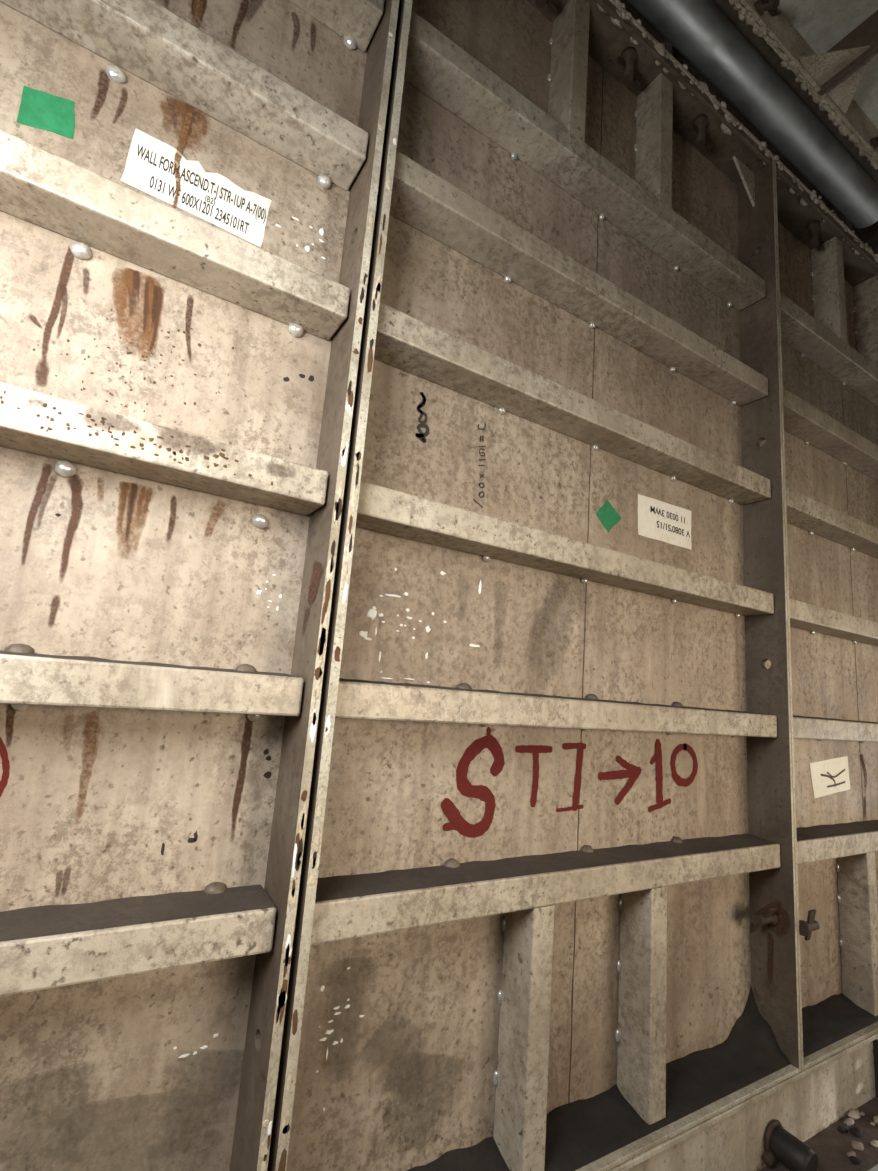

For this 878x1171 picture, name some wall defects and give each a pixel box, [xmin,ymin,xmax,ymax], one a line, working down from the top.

corrosion [231,0,262,48]
corrosion [91,70,109,117]
corrosion [114,89,127,122]
corrosion [160,100,206,208]
corrosion [29,247,89,385]
corrosion [113,269,163,357]
corrosion [22,464,83,578]
corrosion [117,483,152,553]
corrosion [49,596,59,625]
corrosion [303,562,323,632]
corrosion [78,714,98,816]
corrosion [232,719,253,837]